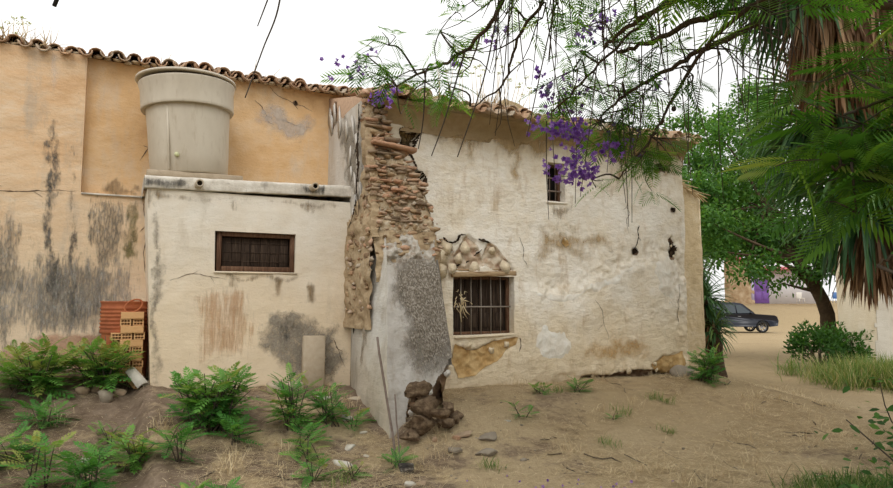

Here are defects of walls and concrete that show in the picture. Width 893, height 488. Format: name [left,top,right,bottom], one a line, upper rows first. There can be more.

damp [0,228,23,290]
damp [33,127,138,333]
spalling [328,88,513,314]
damp [260,313,343,381]
spalling [406,337,518,418]